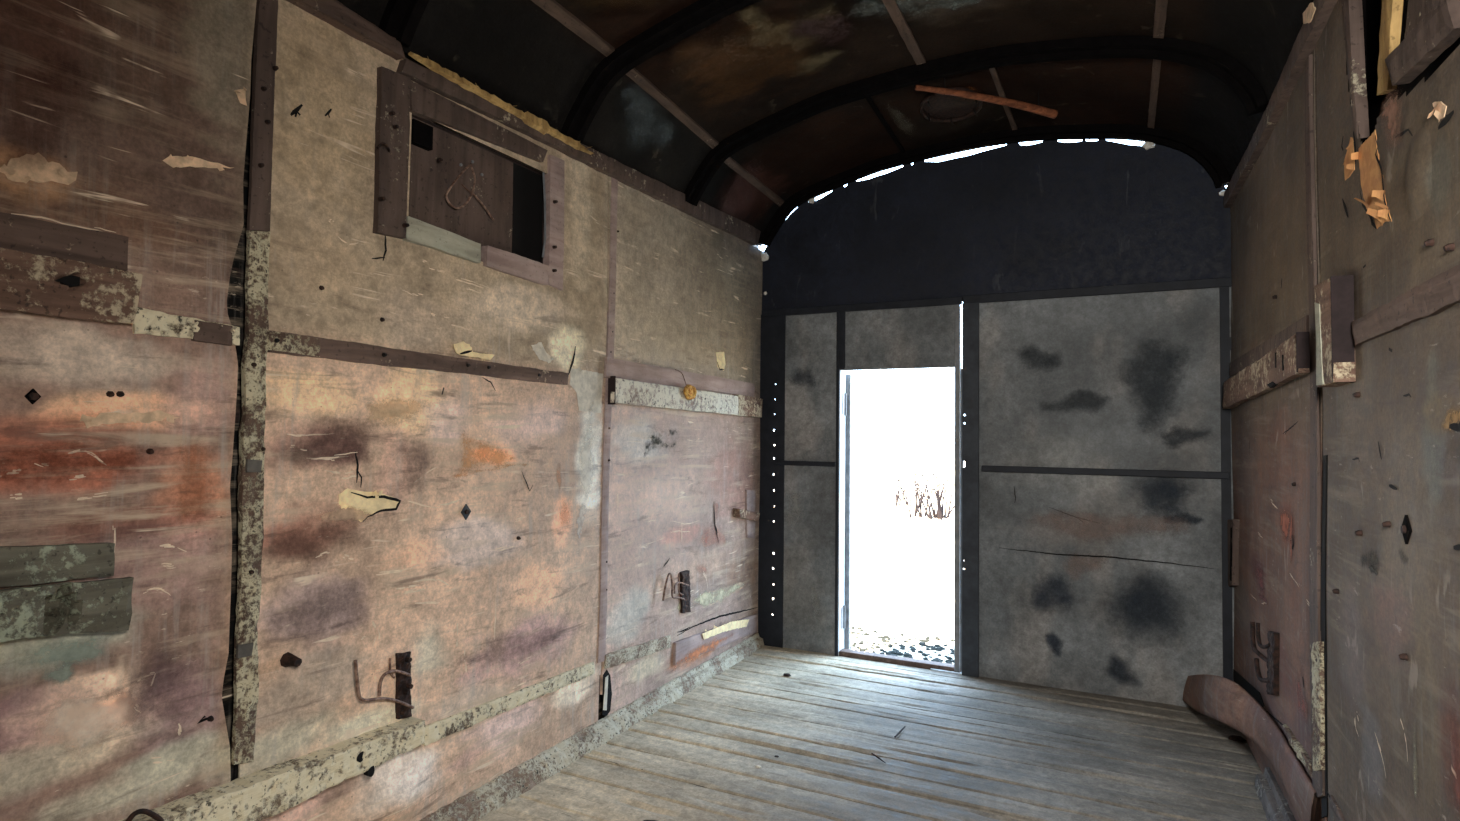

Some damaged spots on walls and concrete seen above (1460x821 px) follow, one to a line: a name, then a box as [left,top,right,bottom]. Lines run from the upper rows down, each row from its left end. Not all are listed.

peeling [1427,101,1447,121]
peeling [0,152,78,185]
peeling [162,154,230,171]
peeling [1343,130,1392,229]
damp [1049,392,1105,409]
damp [1128,345,1207,446]
peeling [290,445,461,522]
damp [1142,477,1201,523]
damp [1119,576,1174,630]
damp [1047,635,1061,655]
damp [1109,658,1135,683]